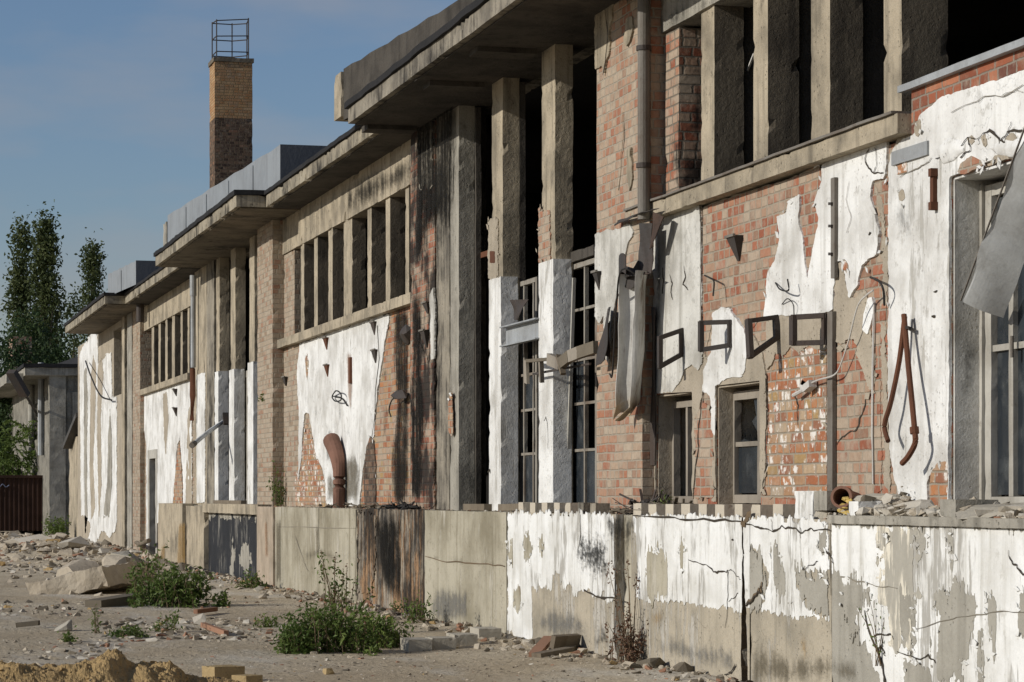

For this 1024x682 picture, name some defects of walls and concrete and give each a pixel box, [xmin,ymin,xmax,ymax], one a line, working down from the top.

spalling [957,133,1020,175]
spalling [535,204,552,263]
spalling [702,165,822,354]
spalling [865,158,908,348]
spalling [295,424,327,507]
peeling [505,530,544,568]
peeling [645,536,686,609]
crack [584,373,894,682]
peeling [743,539,875,646]
crack [864,610,935,682]
peeling [899,526,997,682]
crack [917,611,1024,629]